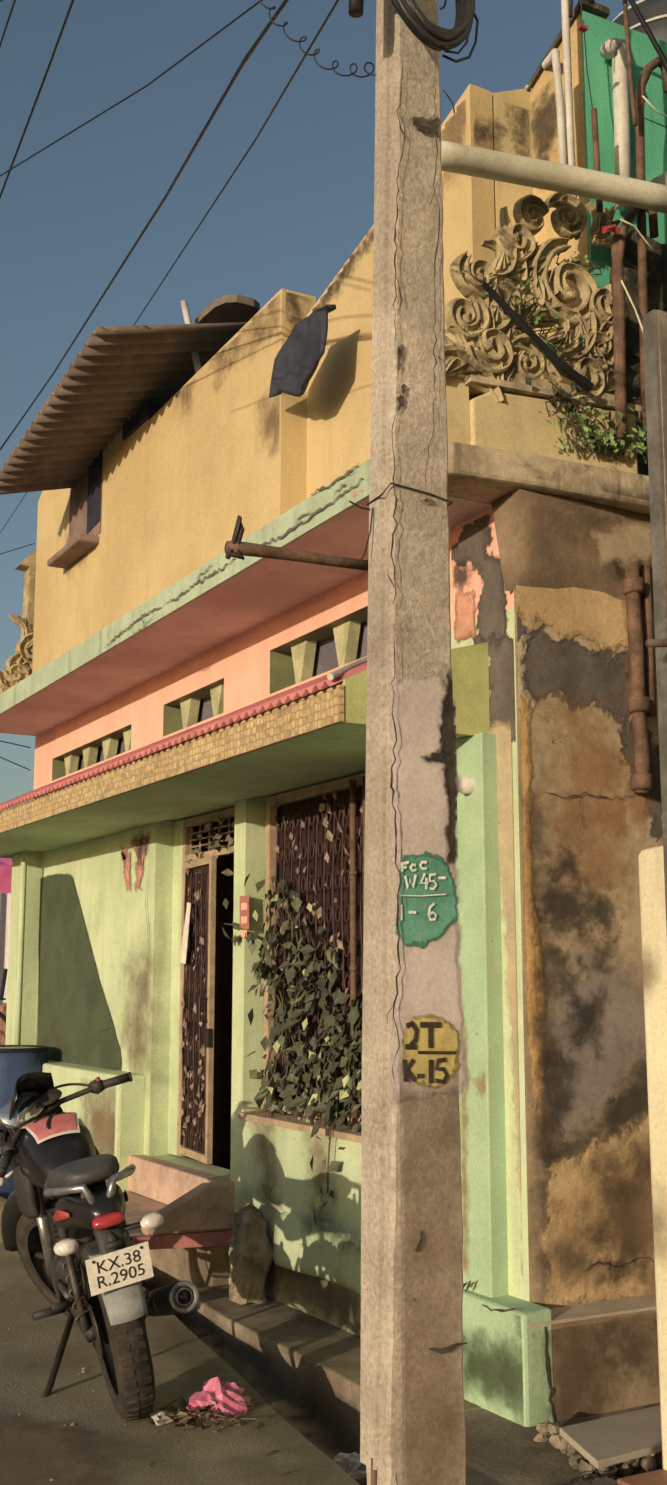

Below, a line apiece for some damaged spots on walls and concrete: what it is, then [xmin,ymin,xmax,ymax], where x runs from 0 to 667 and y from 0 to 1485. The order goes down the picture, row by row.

leakage [443,93,557,161]
leakage [251,231,374,334]
leakage [265,405,279,443]
crack [386,643,403,1094]
peeling [451,514,663,1308]
leakage [539,854,611,968]
leakage [536,949,654,1276]
crack [562,1466,623,1485]